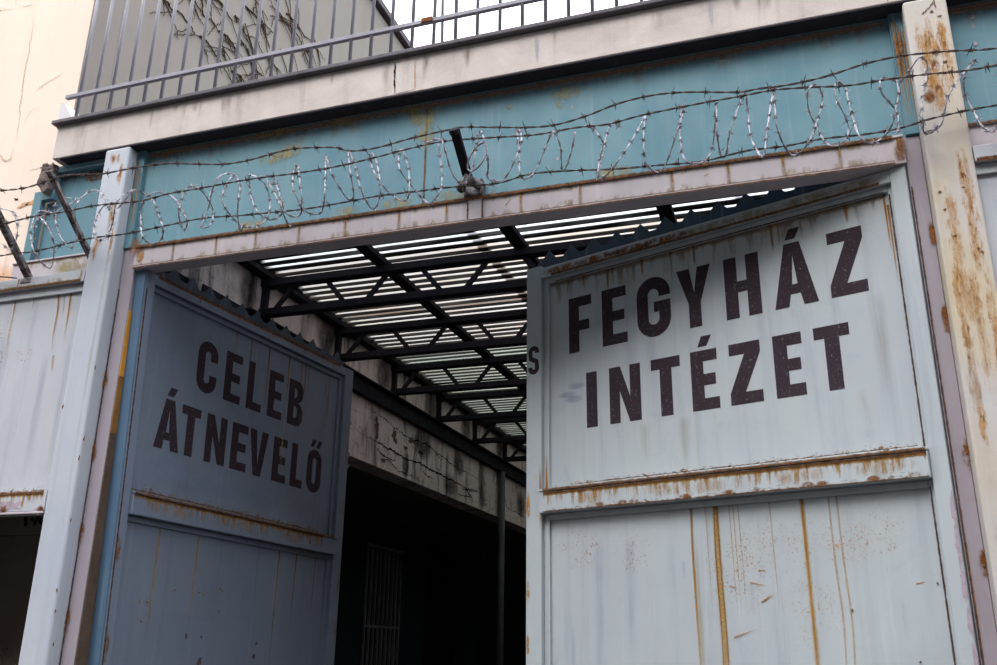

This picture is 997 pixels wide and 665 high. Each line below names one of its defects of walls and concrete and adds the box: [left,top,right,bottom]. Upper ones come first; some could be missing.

corrosion [0,489,44,513]
crack [0,2,57,171]
corrosion [53,289,120,665]
corrosion [102,288,335,665]
corrosion [129,0,997,367]
corrosion [539,181,956,665]
corrosion [911,187,984,665]
corrosion [938,161,997,439]